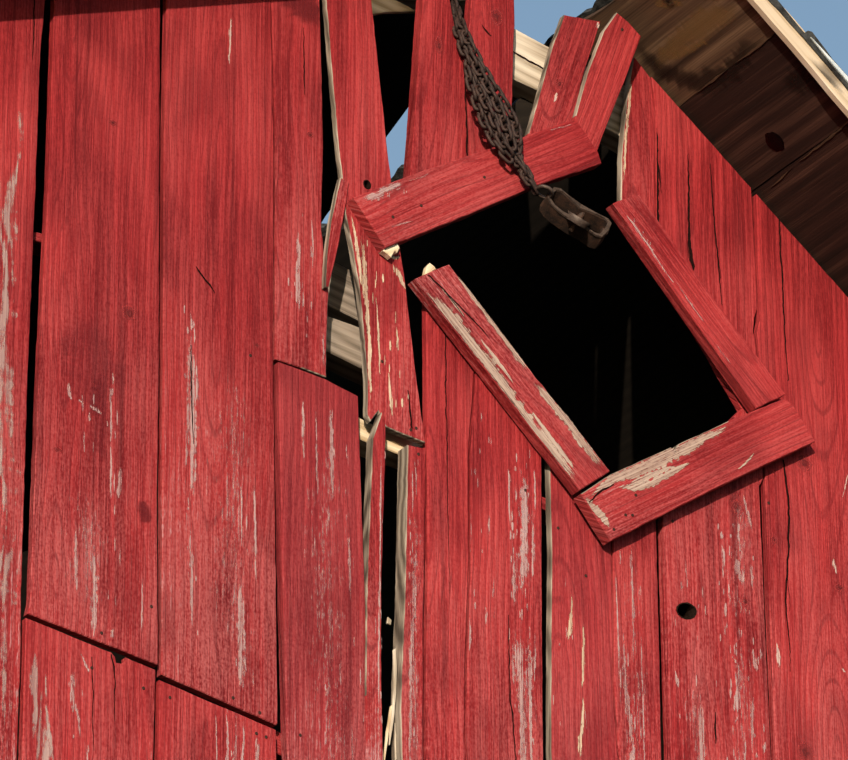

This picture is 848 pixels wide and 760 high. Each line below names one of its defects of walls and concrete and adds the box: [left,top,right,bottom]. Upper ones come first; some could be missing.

peeling [0,163,18,436]
peeling [352,219,403,415]
peeling [428,278,574,475]
peeling [508,450,536,616]
peeling [538,386,600,462]
peeling [586,427,725,527]
crack [655,134,663,222]
crack [687,155,695,270]
crack [710,164,722,304]
crack [782,459,791,672]
peeling [30,657,53,760]
peeling [509,627,536,760]